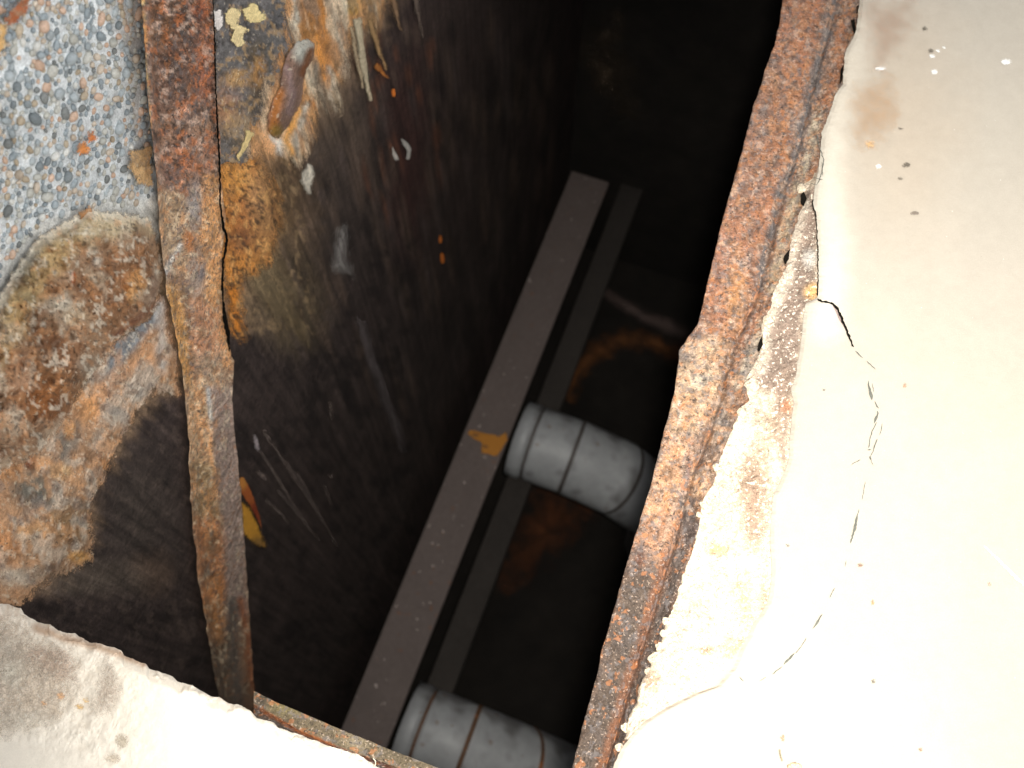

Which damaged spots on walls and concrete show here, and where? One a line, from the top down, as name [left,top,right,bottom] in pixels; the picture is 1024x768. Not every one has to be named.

rust [127,146,154,187]
crack [212,0,230,352]
rust [221,0,402,340]
rust [0,294,182,607]
rust [239,477,266,547]
rust [467,430,508,456]
spalling [615,173,818,752]
crack [740,134,882,681]